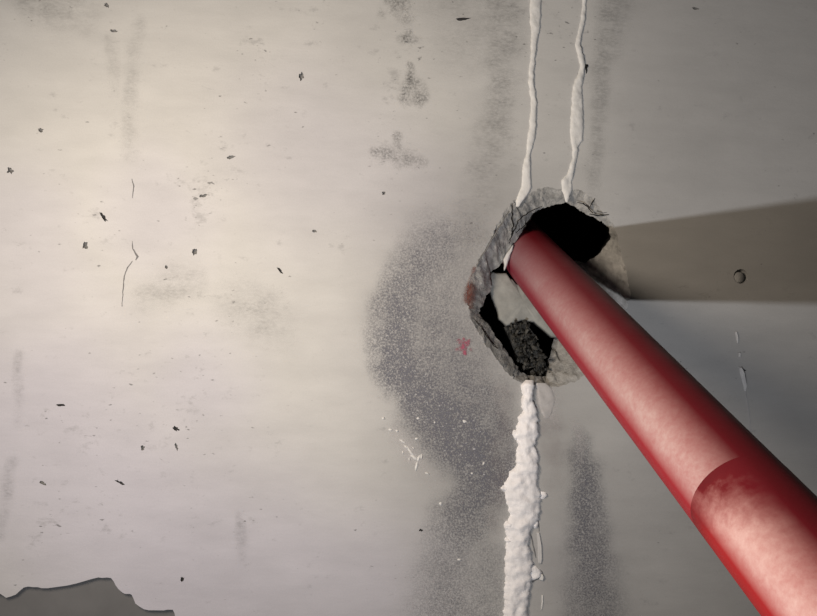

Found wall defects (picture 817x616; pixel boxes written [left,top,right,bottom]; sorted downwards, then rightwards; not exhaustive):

leakage [516,0,542,207]
leakage [561,0,588,202]
leakage [373,243,556,616]
spalling [466,187,631,388]
crack [735,331,751,432]